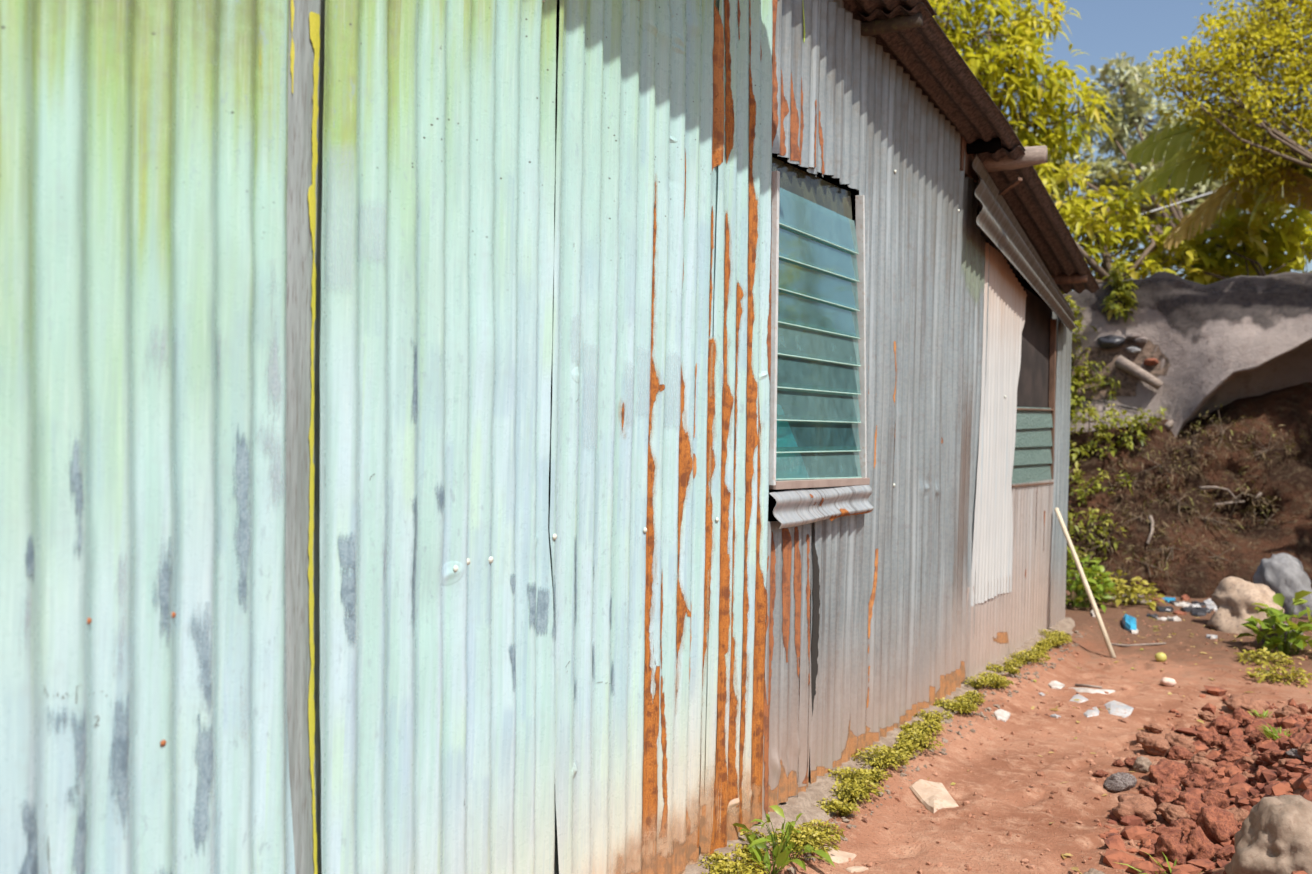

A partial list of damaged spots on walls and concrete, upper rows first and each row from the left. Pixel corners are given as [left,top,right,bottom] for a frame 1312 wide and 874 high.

rust [615,0,965,874]